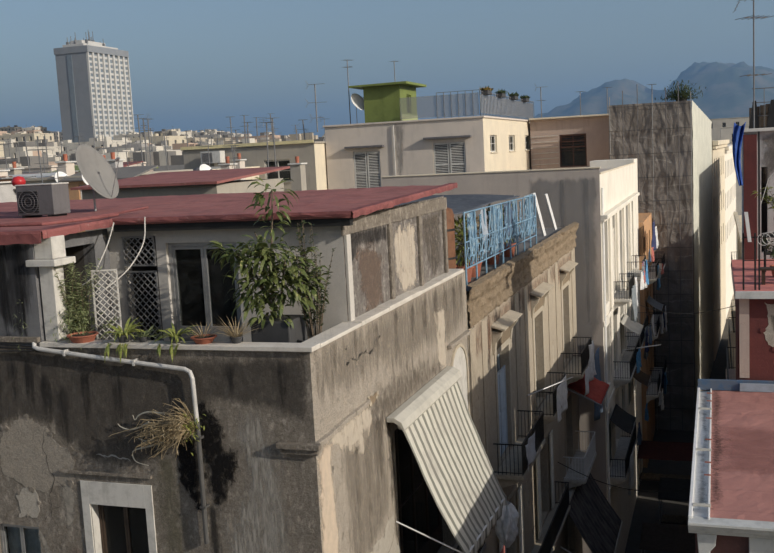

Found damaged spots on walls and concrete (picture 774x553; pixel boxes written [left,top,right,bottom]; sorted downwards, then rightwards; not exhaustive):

damp [351,227,386,259]
damp [0,245,29,335]
peeling [759,299,774,352]
flaking render [0,414,75,518]
damp [0,351,305,553]